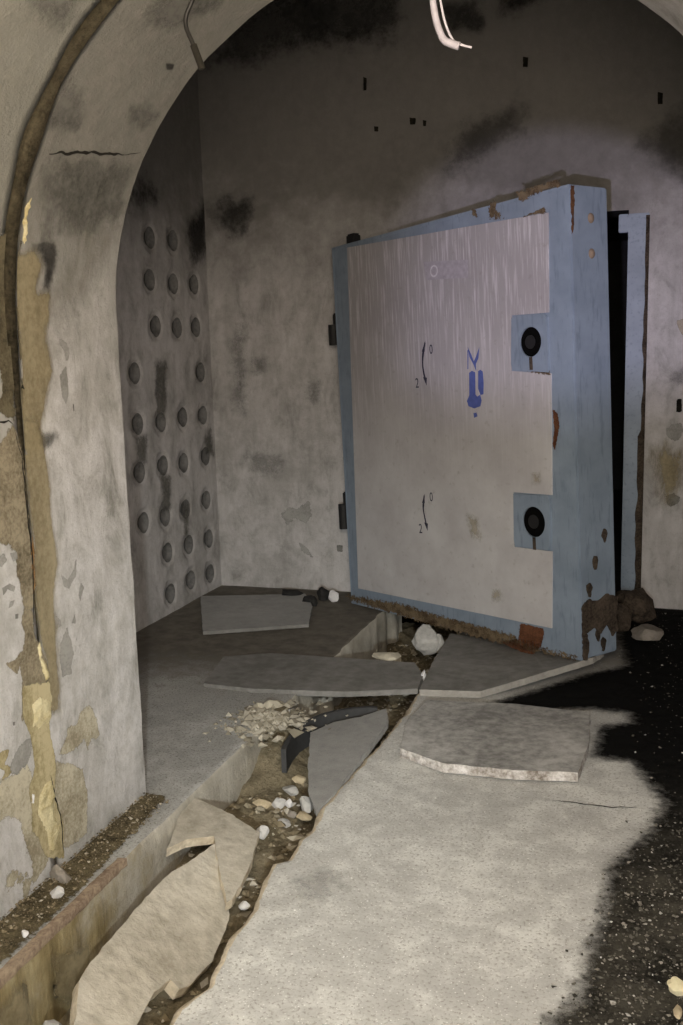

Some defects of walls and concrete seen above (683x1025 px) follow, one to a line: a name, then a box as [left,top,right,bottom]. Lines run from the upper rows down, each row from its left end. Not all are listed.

crack [49,149,137,157]
corrosion [471,200,504,220]
corrosion [516,180,575,233]
corrosion [634,215,650,589]
crack [14,430,35,635]
peeling [2,583,18,619]
peeling [6,651,25,674]
peeling [55,705,99,848]
peeling [0,739,48,898]
crack [51,778,64,853]